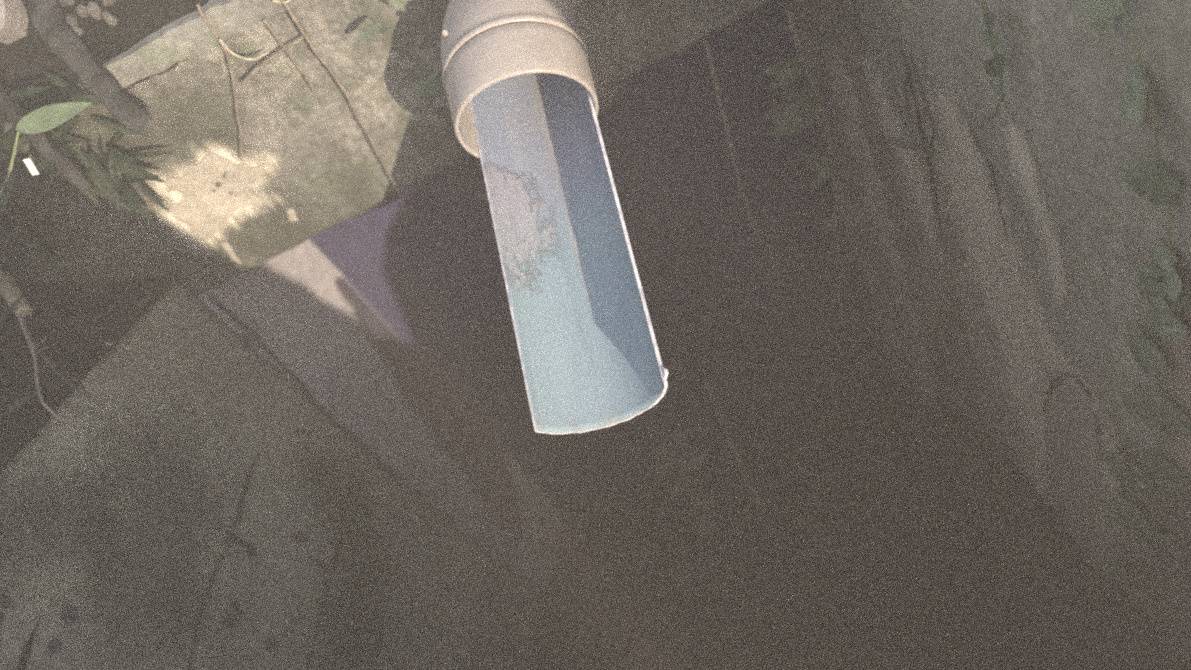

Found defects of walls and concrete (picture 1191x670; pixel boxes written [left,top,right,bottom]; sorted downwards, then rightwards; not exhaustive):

crack [959,105,1009,242]